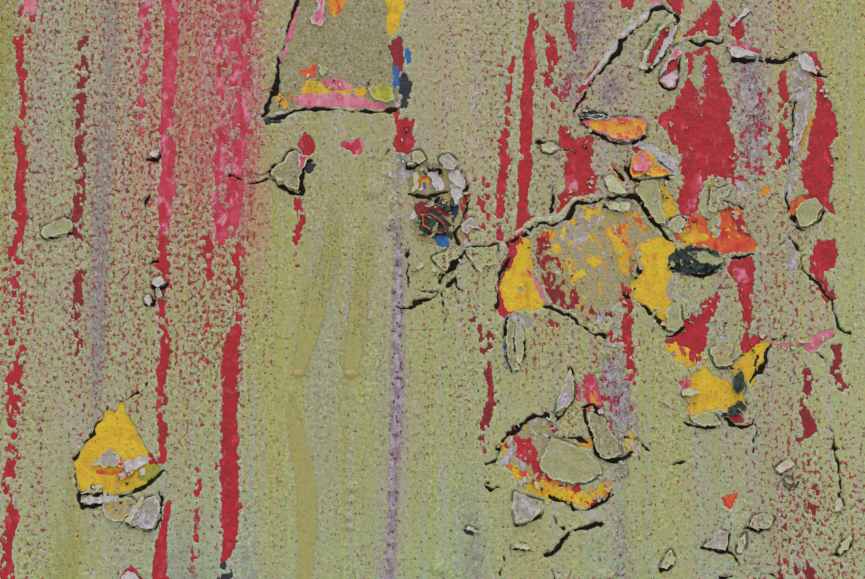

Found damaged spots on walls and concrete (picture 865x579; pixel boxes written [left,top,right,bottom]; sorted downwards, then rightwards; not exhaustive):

peeling [228,131,316,196]
peeling [261,0,840,453]
peeling [72,383,165,530]
peeling [485,367,641,527]
peeling [774,459,799,486]
crack [543,518,603,579]